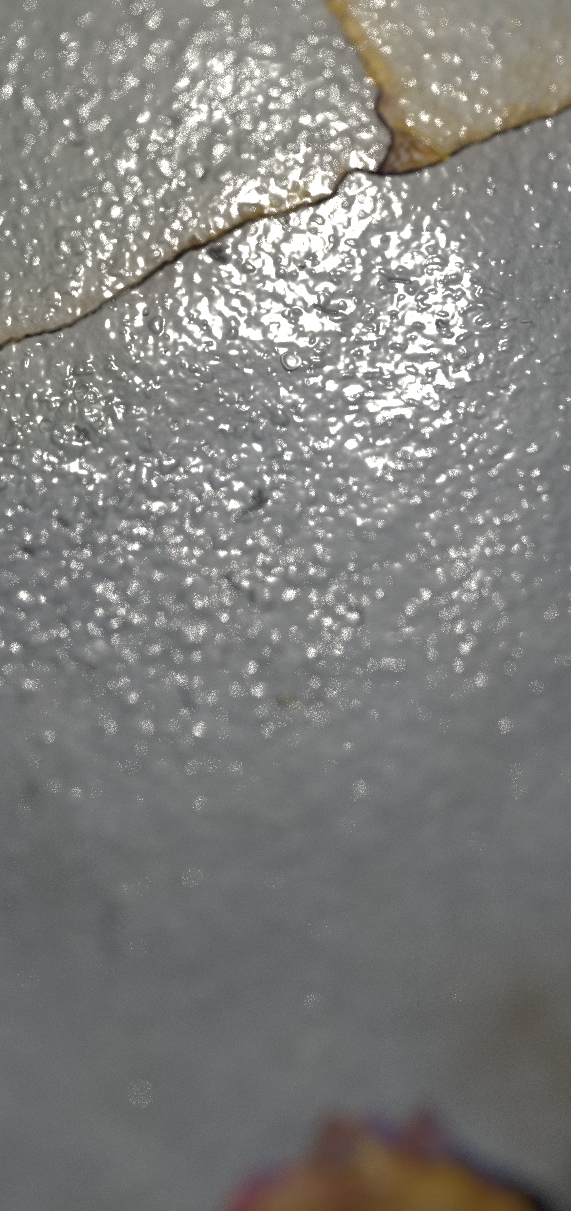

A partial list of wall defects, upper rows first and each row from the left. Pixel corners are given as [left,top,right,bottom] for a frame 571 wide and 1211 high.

corrosion [326,0,404,132]
crack [130,0,571,288]
spalling [368,91,449,176]
corrosion [174,187,316,253]
crack [0,306,102,350]